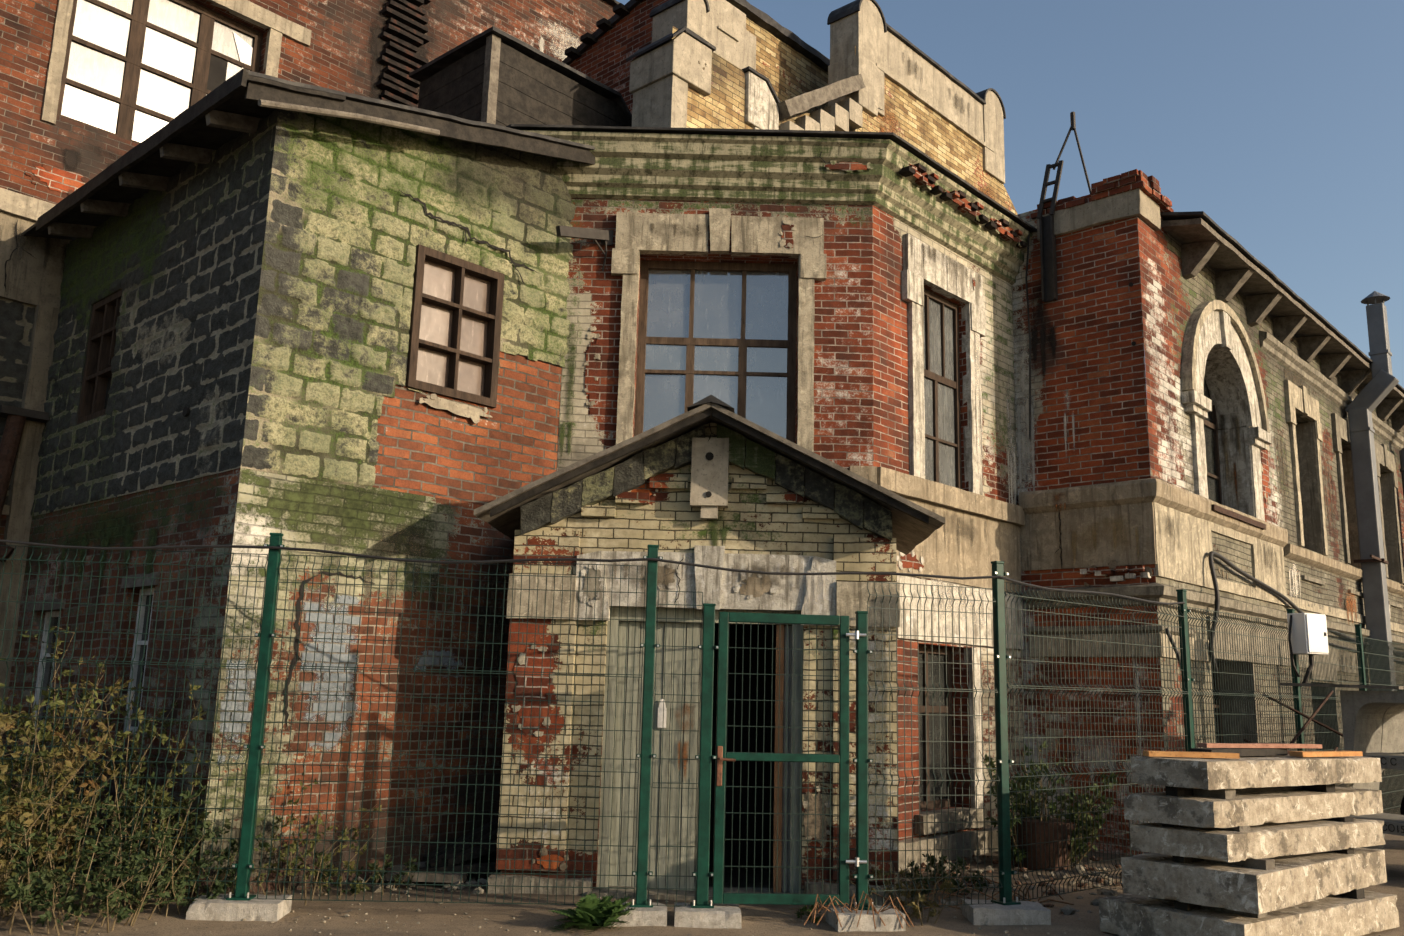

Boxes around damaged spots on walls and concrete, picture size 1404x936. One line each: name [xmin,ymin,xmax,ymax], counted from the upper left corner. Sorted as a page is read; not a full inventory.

peeling [584,326,601,414]
leakage [1007,327,1056,505]
crack [283,571,375,730]
peeling [300,589,361,750]
peeling [512,641,556,737]
flaking render [803,786,832,848]